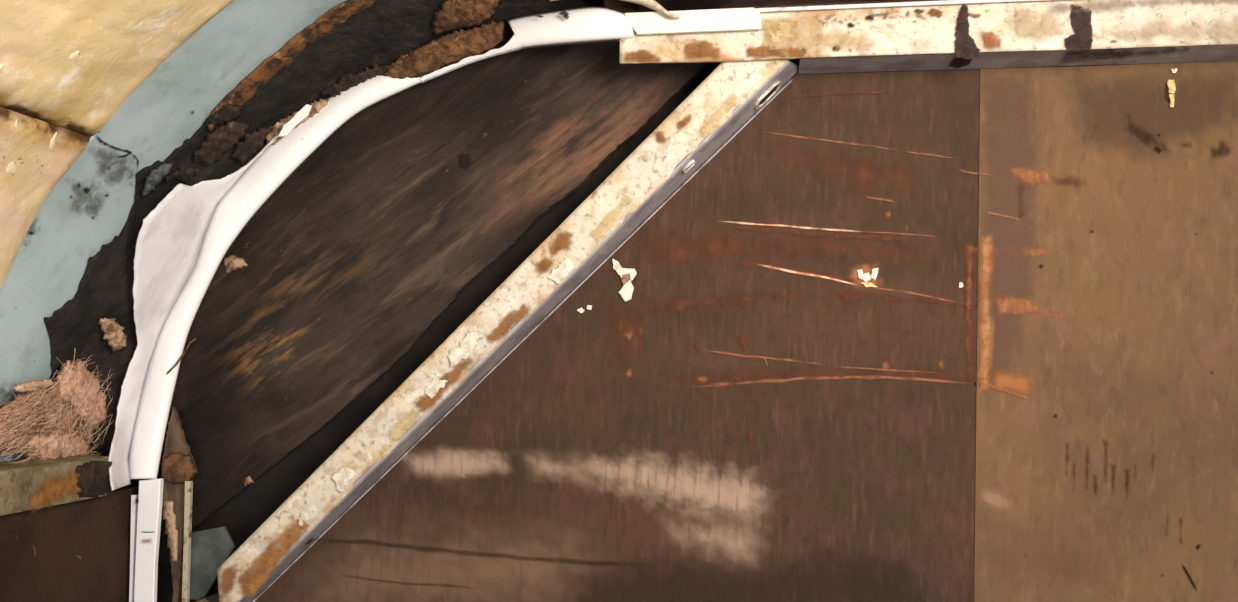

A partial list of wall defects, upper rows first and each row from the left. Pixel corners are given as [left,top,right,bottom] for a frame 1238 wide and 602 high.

rust [537,232,572,272]
peeling [548,258,576,284]
peeling [612,259,637,302]
peeling [851,265,879,288]
rust [487,306,529,342]
rust [925,237,1056,393]
peeling [425,332,485,398]
rust [389,358,472,439]
damp [410,450,506,477]
damp [533,458,765,518]
rust [220,521,308,597]
damp [696,530,750,557]